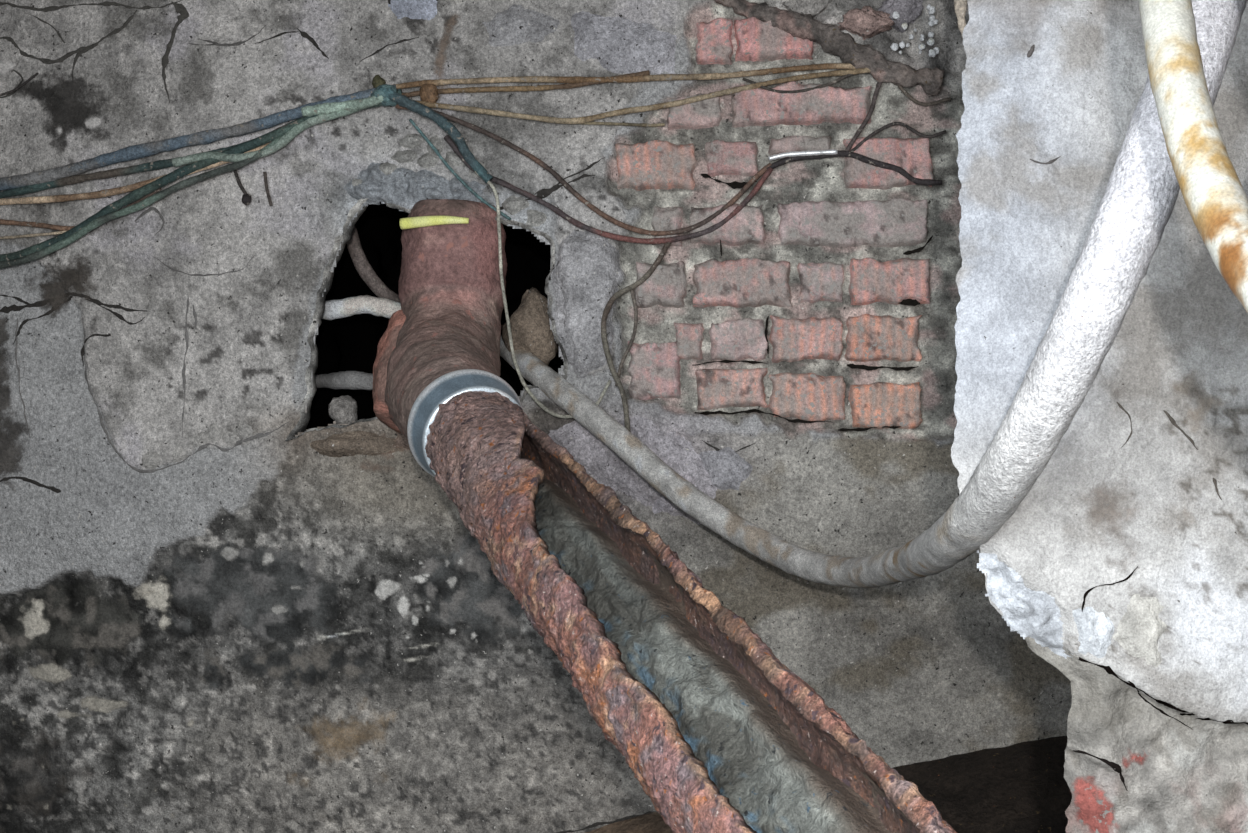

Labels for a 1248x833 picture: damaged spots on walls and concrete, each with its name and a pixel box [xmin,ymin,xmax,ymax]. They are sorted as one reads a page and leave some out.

crack [0,0,329,103]
spalling [837,0,924,40]
crack [0,292,148,366]
spalling [82,133,486,473]
spalling [495,196,568,402]
flaking render [615,81,933,431]
water stain [0,580,141,683]
water stain [163,543,369,690]
water stain [375,535,525,644]
crack [1082,566,1138,611]
water stain [59,696,127,718]
crack [1079,657,1248,728]